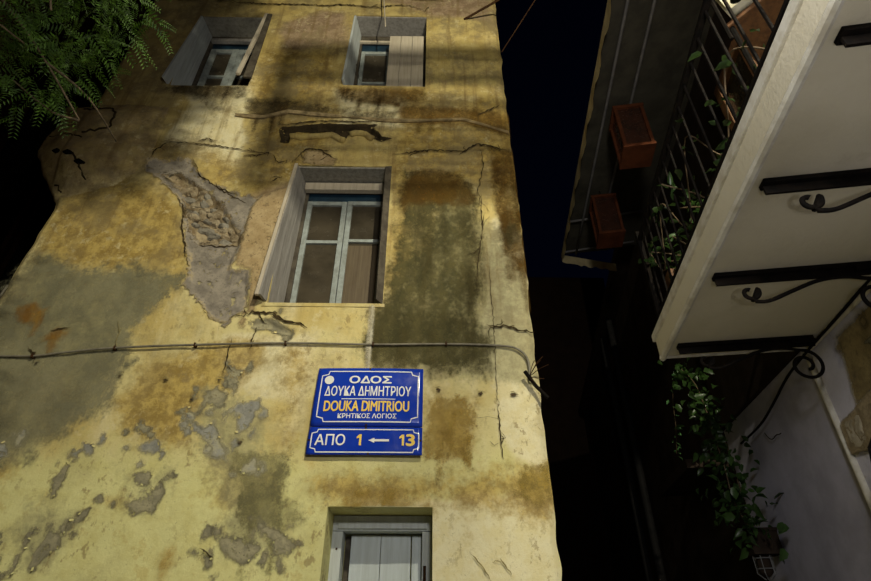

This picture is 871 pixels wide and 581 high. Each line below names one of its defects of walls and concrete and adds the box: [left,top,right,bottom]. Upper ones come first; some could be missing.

flaking render [279,120,392,165]
peeling [0,156,294,467]
crack [223,310,307,373]
water stain [363,171,495,375]
crack [392,143,534,459]
peeling [50,433,107,498]
peeling [123,420,179,516]
peeling [0,494,116,579]
peeling [188,517,304,581]